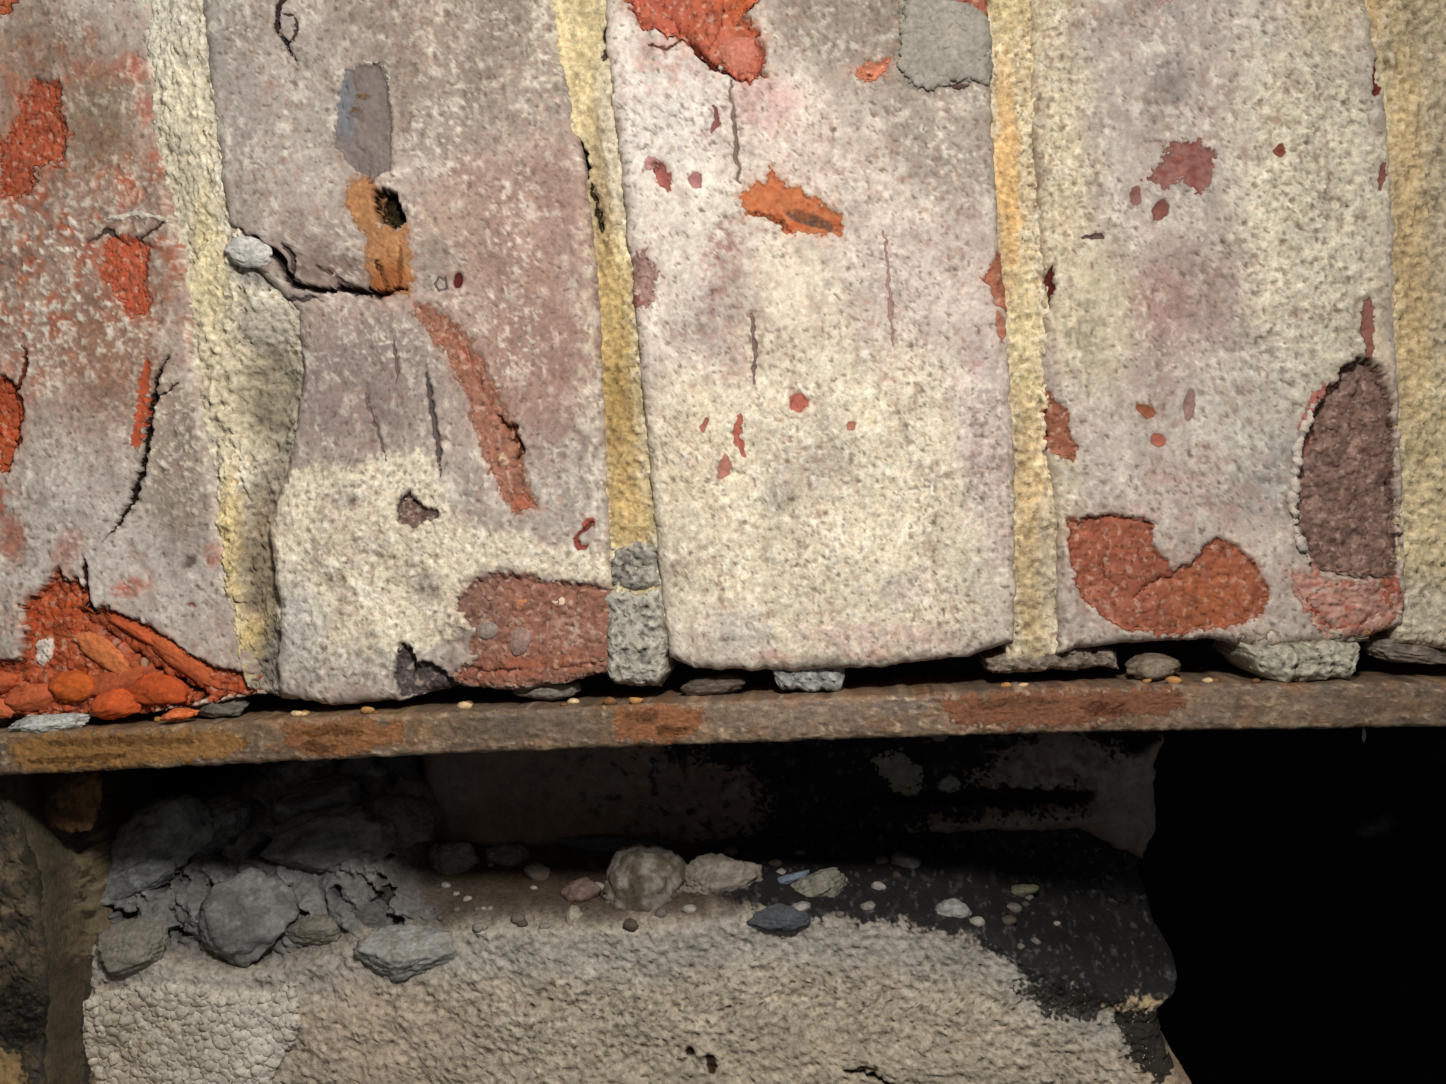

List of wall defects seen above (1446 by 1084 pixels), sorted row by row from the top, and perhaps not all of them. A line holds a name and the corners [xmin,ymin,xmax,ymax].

crack [274,0,299,61]
spalling [625,0,767,85]
crack [241,228,408,302]
crack [365,339,442,477]
crack [82,357,179,611]
spalling [1284,360,1405,641]
spalling [1067,514,1269,639]
spalling [0,569,264,720]
corrosion [7,725,250,773]
corrosion [281,715,405,761]
corrosion [610,702,707,746]
corrosion [935,685,1186,735]